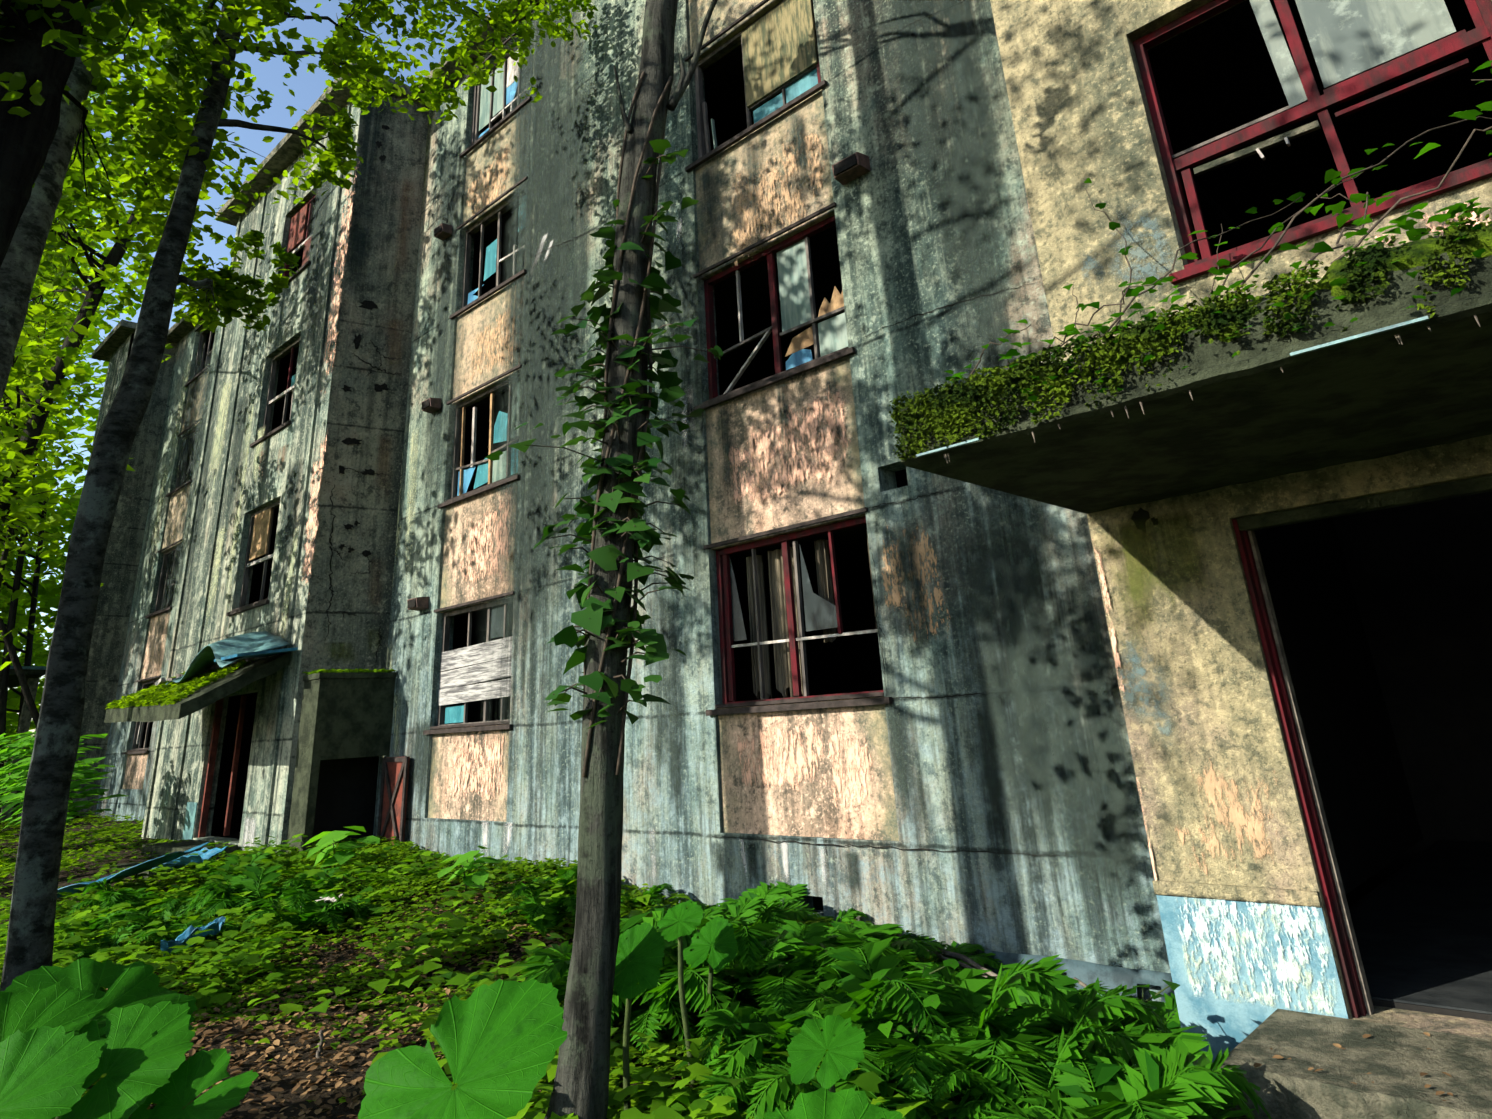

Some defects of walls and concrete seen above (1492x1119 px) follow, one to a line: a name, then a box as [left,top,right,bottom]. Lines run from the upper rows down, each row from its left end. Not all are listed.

water stain [304,168,329,327]
water stain [885,0,1014,382]
water stain [396,113,466,545]
water stain [154,360,262,612]
water stain [282,464,299,625]
water stain [777,386,788,445]
water stain [829,382,840,455]
water stain [897,529,925,642]
water stain [394,695,430,788]
water stain [888,712,924,818]
water stain [957,486,1171,891]
peeling [1178,897,1334,1014]